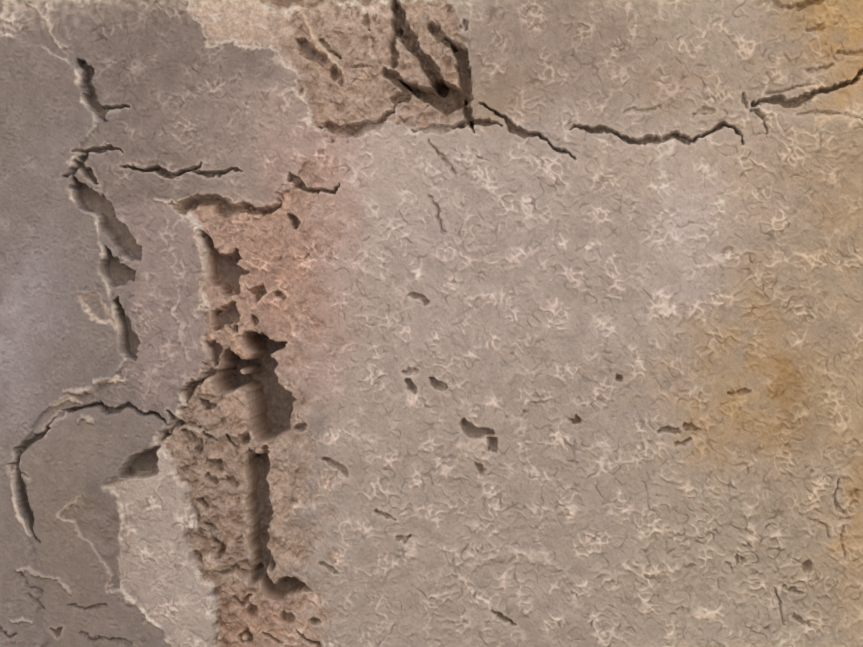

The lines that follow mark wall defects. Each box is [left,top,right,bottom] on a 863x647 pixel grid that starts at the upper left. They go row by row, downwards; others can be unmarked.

spalling [188,0,465,144]
crack [311,0,863,180]
crack [427,194,447,236]
crack [6,401,168,544]
spalling [161,156,349,647]
spalling [373,508,396,521]
crack [0,626,18,639]
crack [15,571,134,647]